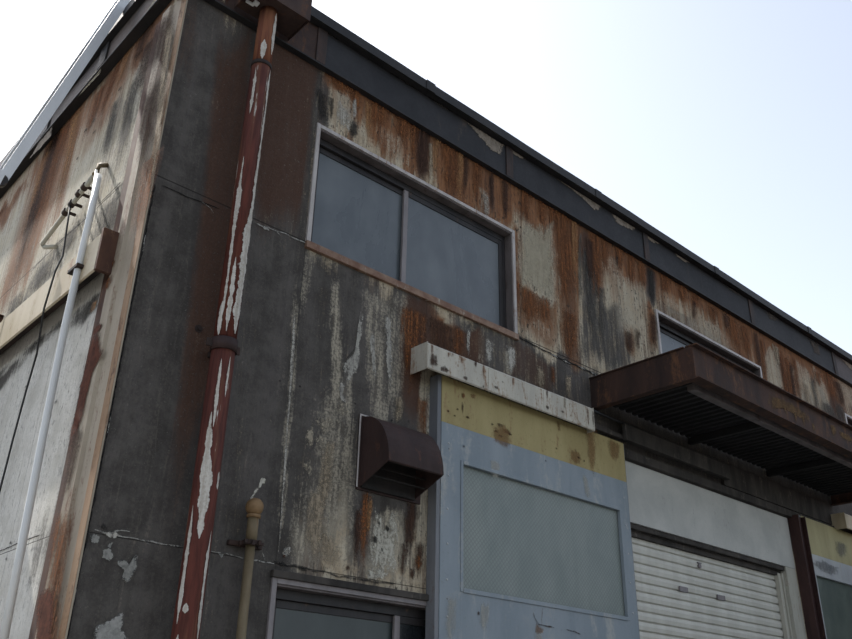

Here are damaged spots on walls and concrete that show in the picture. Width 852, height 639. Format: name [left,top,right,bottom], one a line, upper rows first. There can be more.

rust [18,15,173,259]
rust [429,138,509,218]
rust [64,324,103,493]
leakage [281,319,295,513]
rust [401,305,464,378]
rust [755,335,845,408]
peeling [177,356,231,639]
rust [36,516,67,639]
spalling [90,534,137,582]
crack [211,551,274,564]
rust [401,503,423,579]
spalling [95,613,127,639]